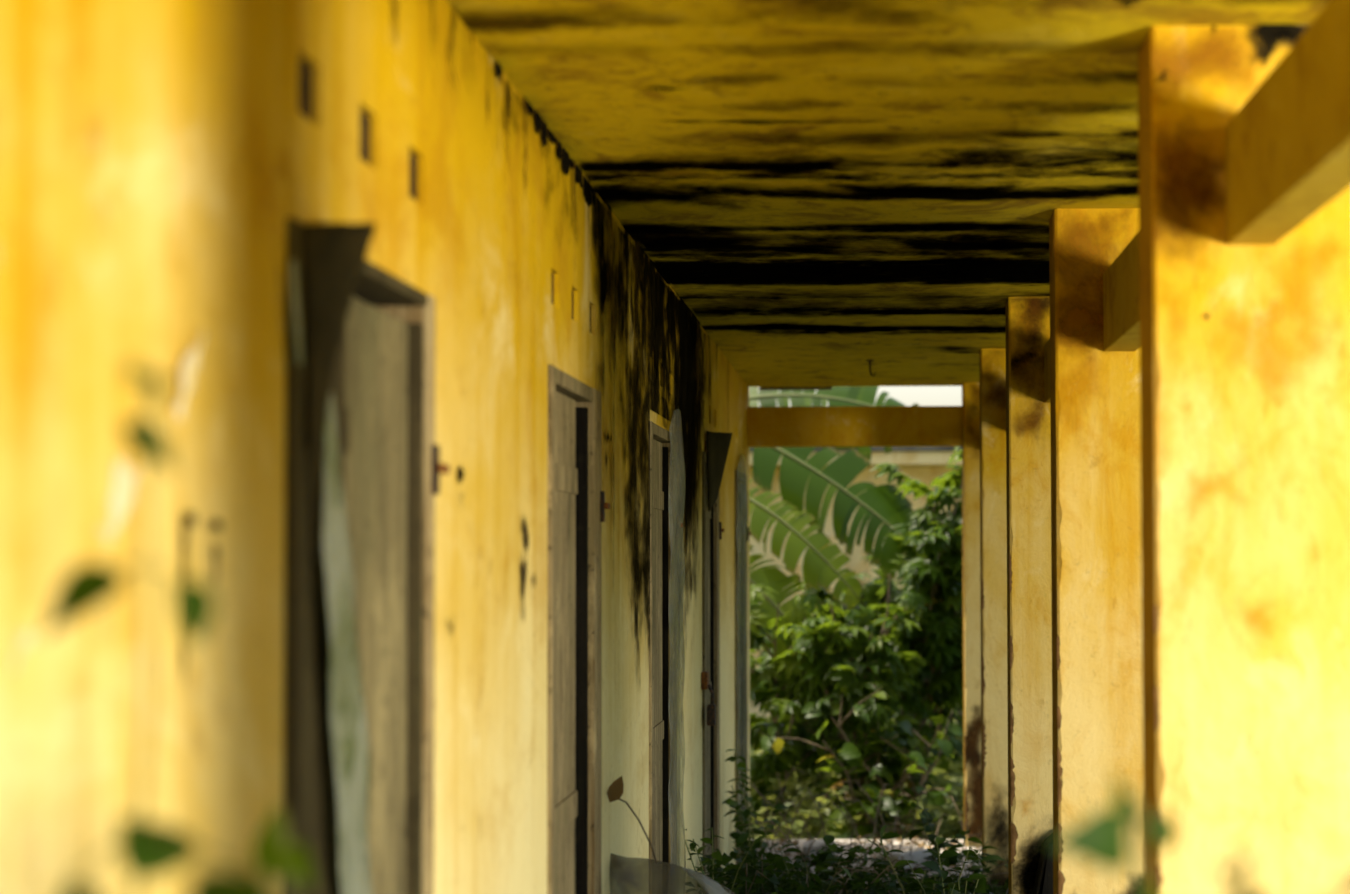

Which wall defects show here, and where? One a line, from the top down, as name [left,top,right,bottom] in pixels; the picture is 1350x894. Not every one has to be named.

water stain [1085,26,1238,85]
water stain [488,85,527,129]
water stain [725,106,800,124]
water stain [1159,138,1216,237]
water stain [573,131,1139,658]